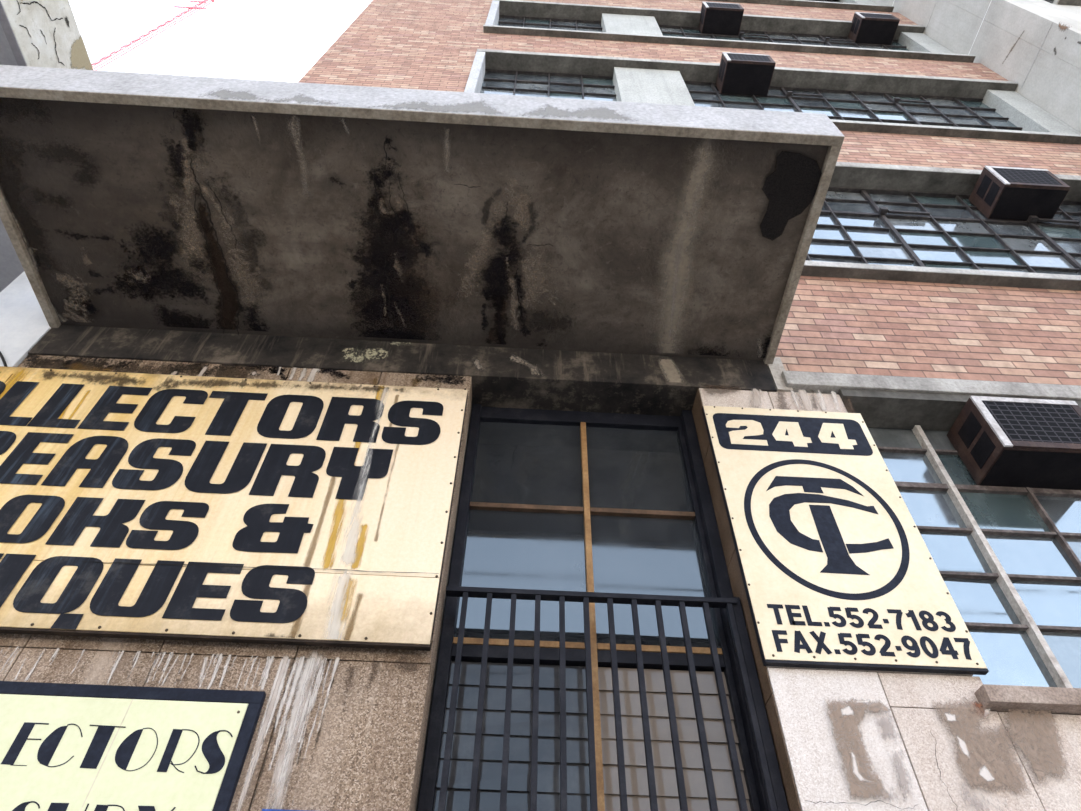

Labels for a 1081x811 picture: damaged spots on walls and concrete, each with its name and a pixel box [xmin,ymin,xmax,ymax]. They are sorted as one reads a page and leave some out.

crack [17,1,65,66]
water stain [0,97,215,329]
water stain [347,138,576,375]
spalling [760,151,822,241]
water stain [21,354,350,382]
water stain [413,374,466,387]
efflorescence [1,646,59,680]
efflorescence [108,651,340,811]